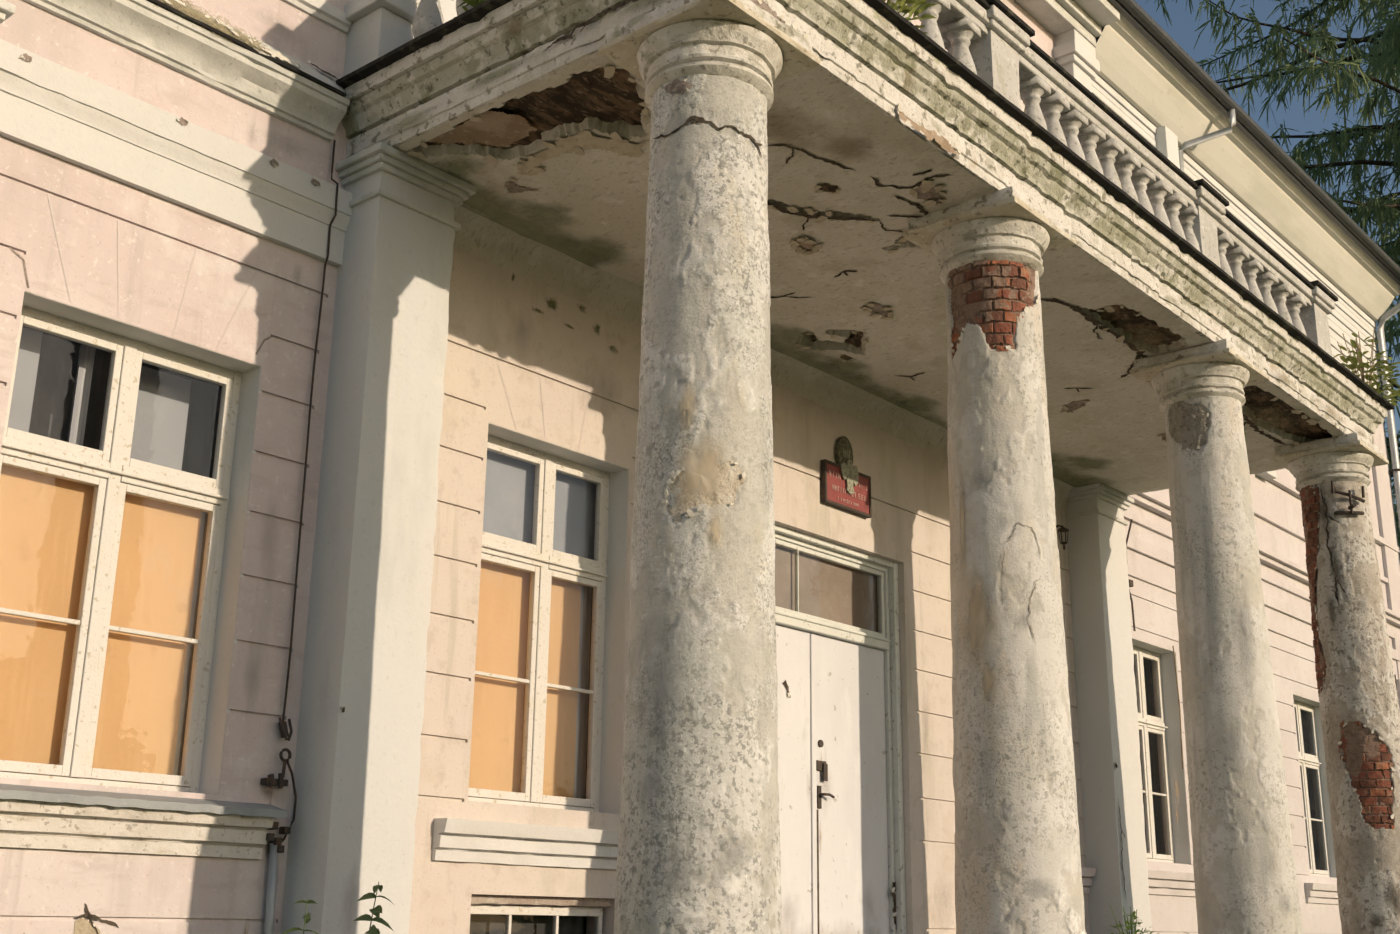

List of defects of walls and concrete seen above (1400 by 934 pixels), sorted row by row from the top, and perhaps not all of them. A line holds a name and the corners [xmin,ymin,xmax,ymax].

peeling [159,0,340,79]
spalling [406,66,649,166]
crack [651,116,949,233]
crack [770,270,857,298]
flaking render [947,259,1040,359]
crack [1041,298,1148,392]
spalling [1243,385,1332,446]
peeling [661,458,746,524]
crack [1002,522,1041,642]
flaking render [1299,485,1327,701]
flaking render [1338,717,1395,830]
spalling [74,918,100,934]